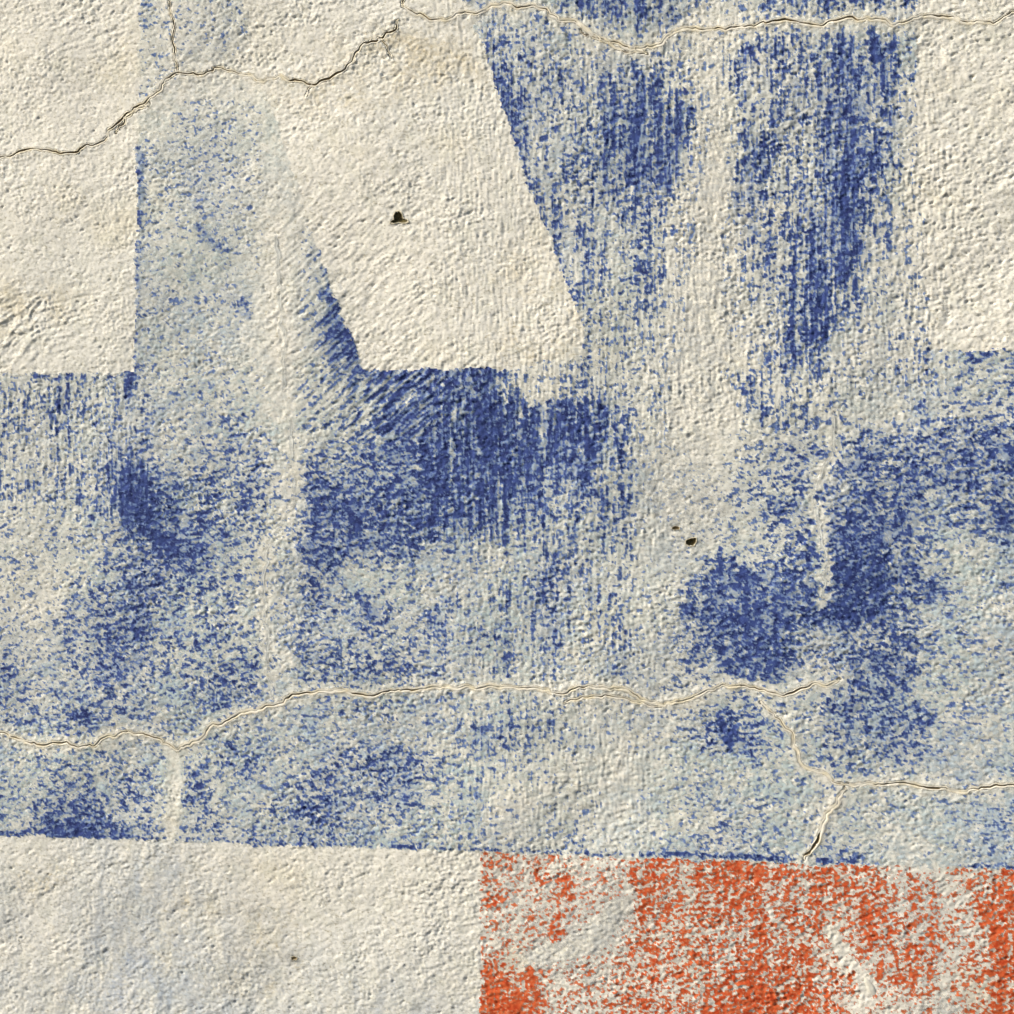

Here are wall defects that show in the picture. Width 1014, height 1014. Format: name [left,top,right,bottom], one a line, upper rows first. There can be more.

crack [0,0,1014,159]
crack [274,238,283,329]
crack [0,550,1014,860]